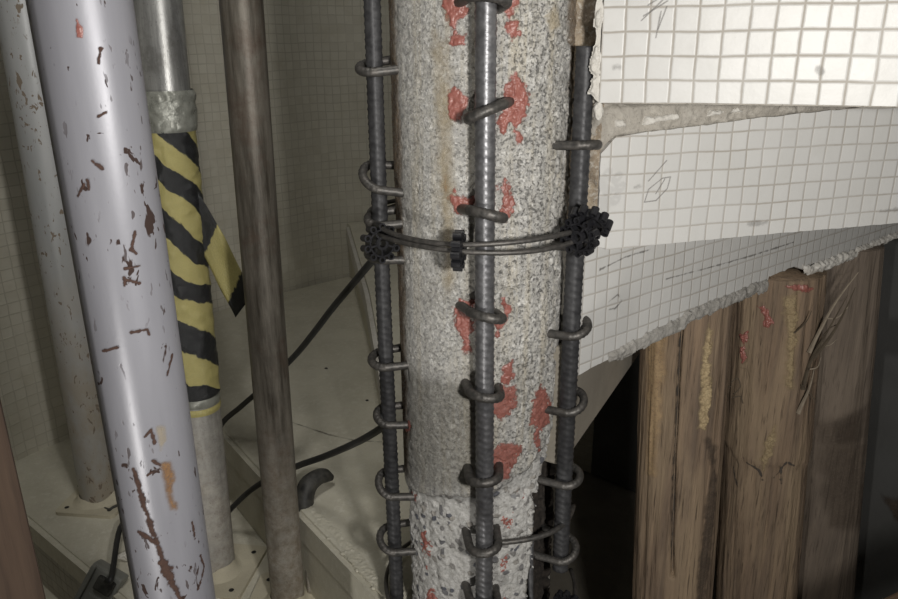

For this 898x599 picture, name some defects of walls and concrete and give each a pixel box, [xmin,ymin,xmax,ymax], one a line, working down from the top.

flaking render [593,0,603,30]
flaking render [587,43,850,148]
spalling [802,231,898,275]
spalling [608,279,769,362]
damp [494,359,518,419]
damp [529,384,552,452]
damp [493,443,522,479]